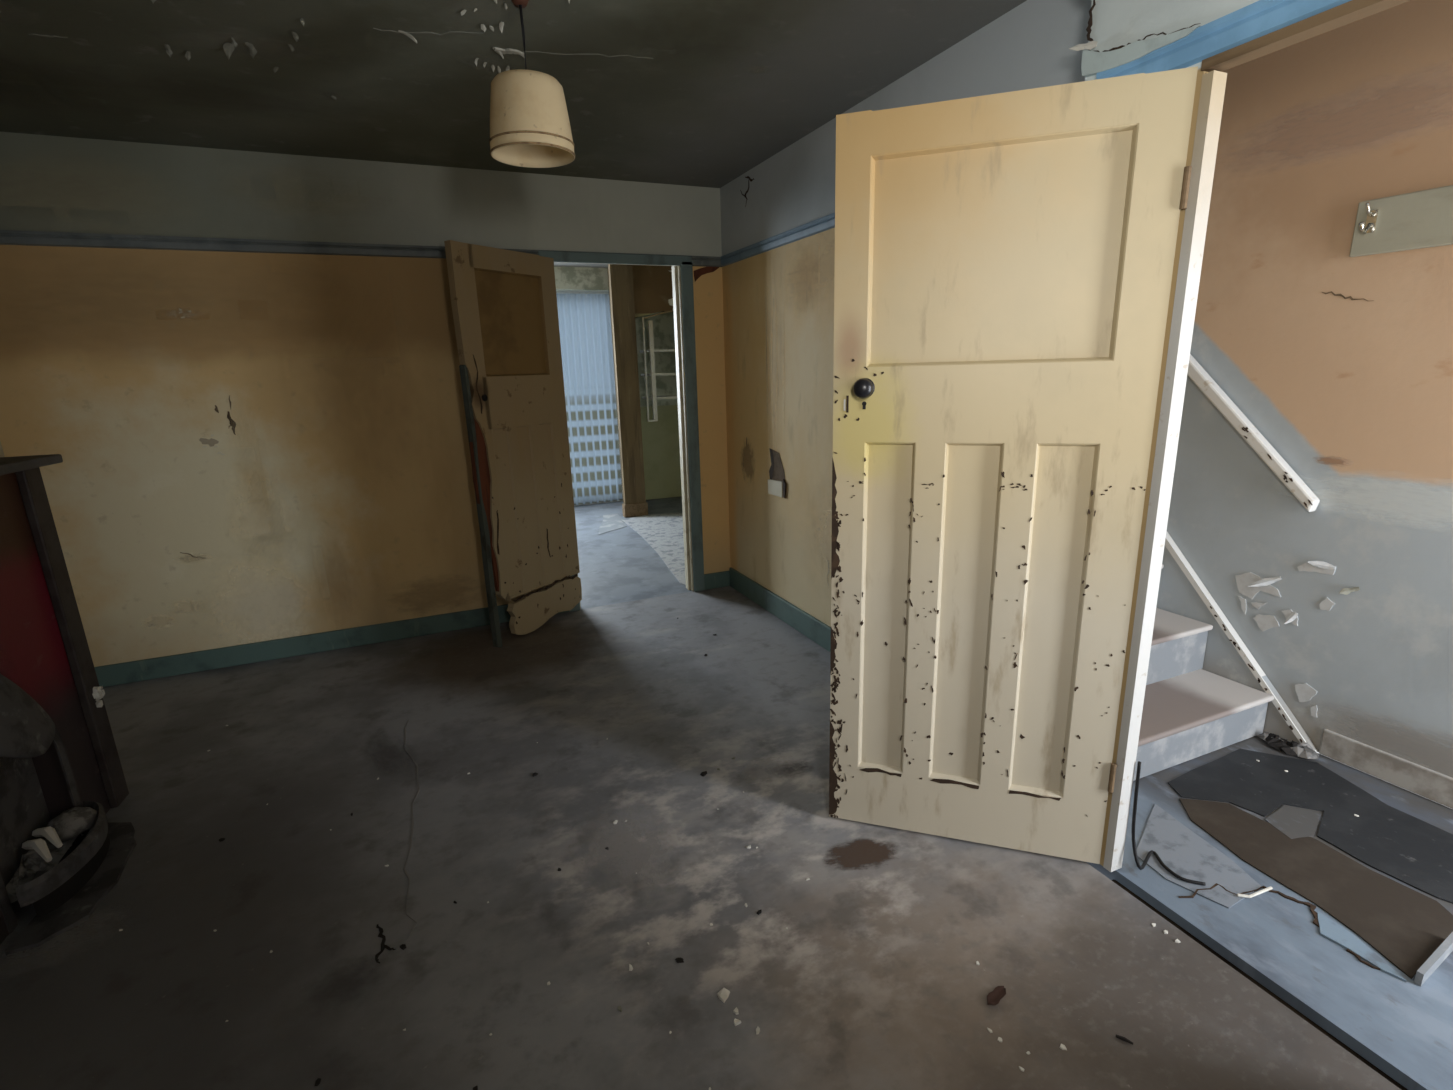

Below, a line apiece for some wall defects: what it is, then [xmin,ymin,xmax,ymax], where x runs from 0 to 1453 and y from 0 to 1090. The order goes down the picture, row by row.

peeling [461,0,525,73]
crack [1086,0,1201,52]
spalling [769,448,786,482]
peeling [1235,572,1298,631]
peeling [1297,561,1360,611]
water stain [826,839,895,870]
crack [375,924,396,963]